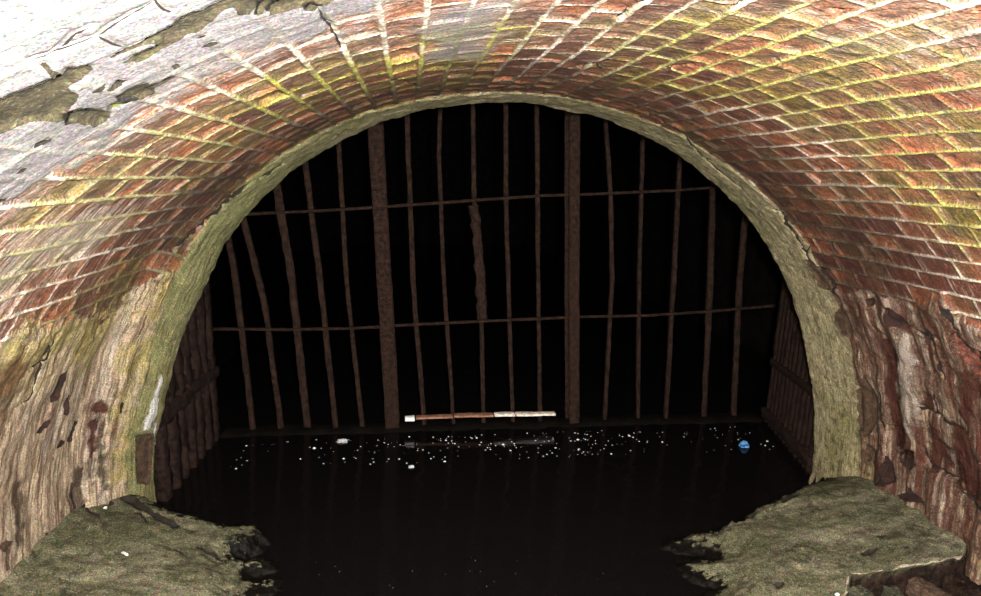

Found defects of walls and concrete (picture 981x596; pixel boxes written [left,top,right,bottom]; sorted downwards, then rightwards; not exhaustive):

crack [28,0,171,63]
peeling [111,0,334,63]
peeling [0,62,180,134]
spalling [834,308,854,338]
spalling [865,296,911,329]
spalling [856,377,915,487]
water stain [11,481,25,548]
water stain [69,467,83,509]
water stain [96,454,109,490]
spalling [898,488,924,504]